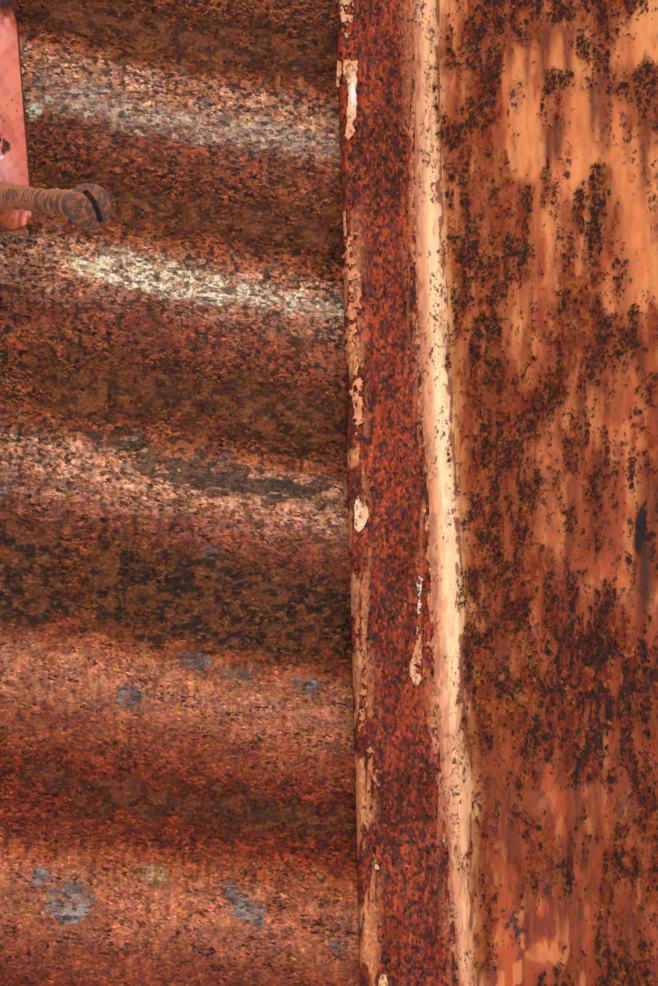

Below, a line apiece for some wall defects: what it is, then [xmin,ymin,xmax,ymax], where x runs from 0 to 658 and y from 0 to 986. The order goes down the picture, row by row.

peeling [336,0,355,38]
peeling [336,60,358,140]
rust [87,412,348,510]
rust [429,0,658,986]
rust [239,857,327,884]